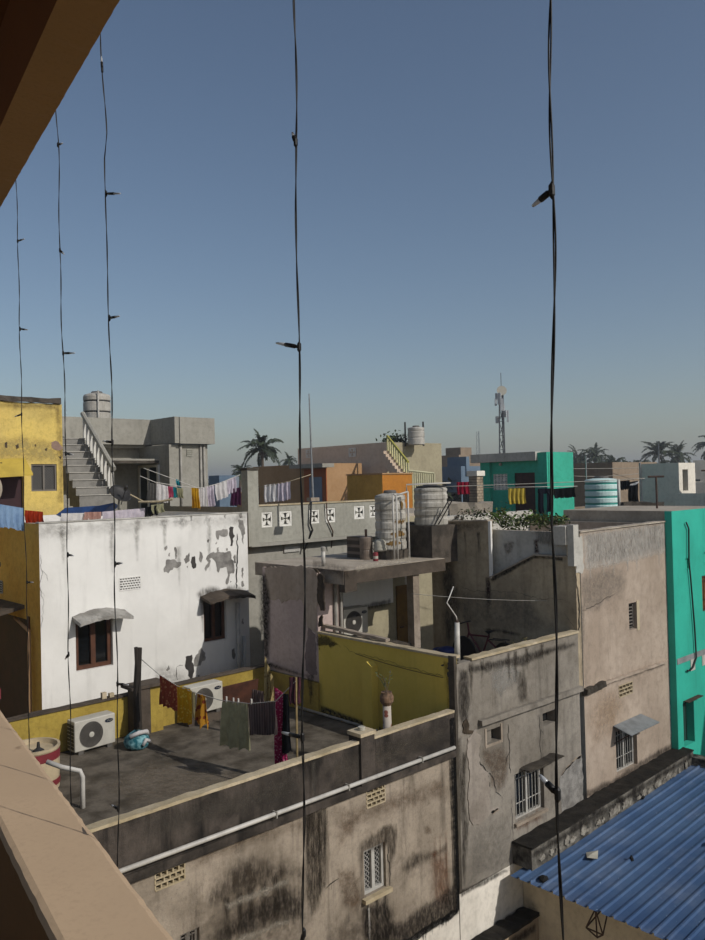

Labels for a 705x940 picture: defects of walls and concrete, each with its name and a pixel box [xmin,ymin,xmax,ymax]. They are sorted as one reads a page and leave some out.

peeling [164,513,245,587]
peeling [185,647,206,679]
leakage [362,645,571,940]
leakage [212,812,325,940]